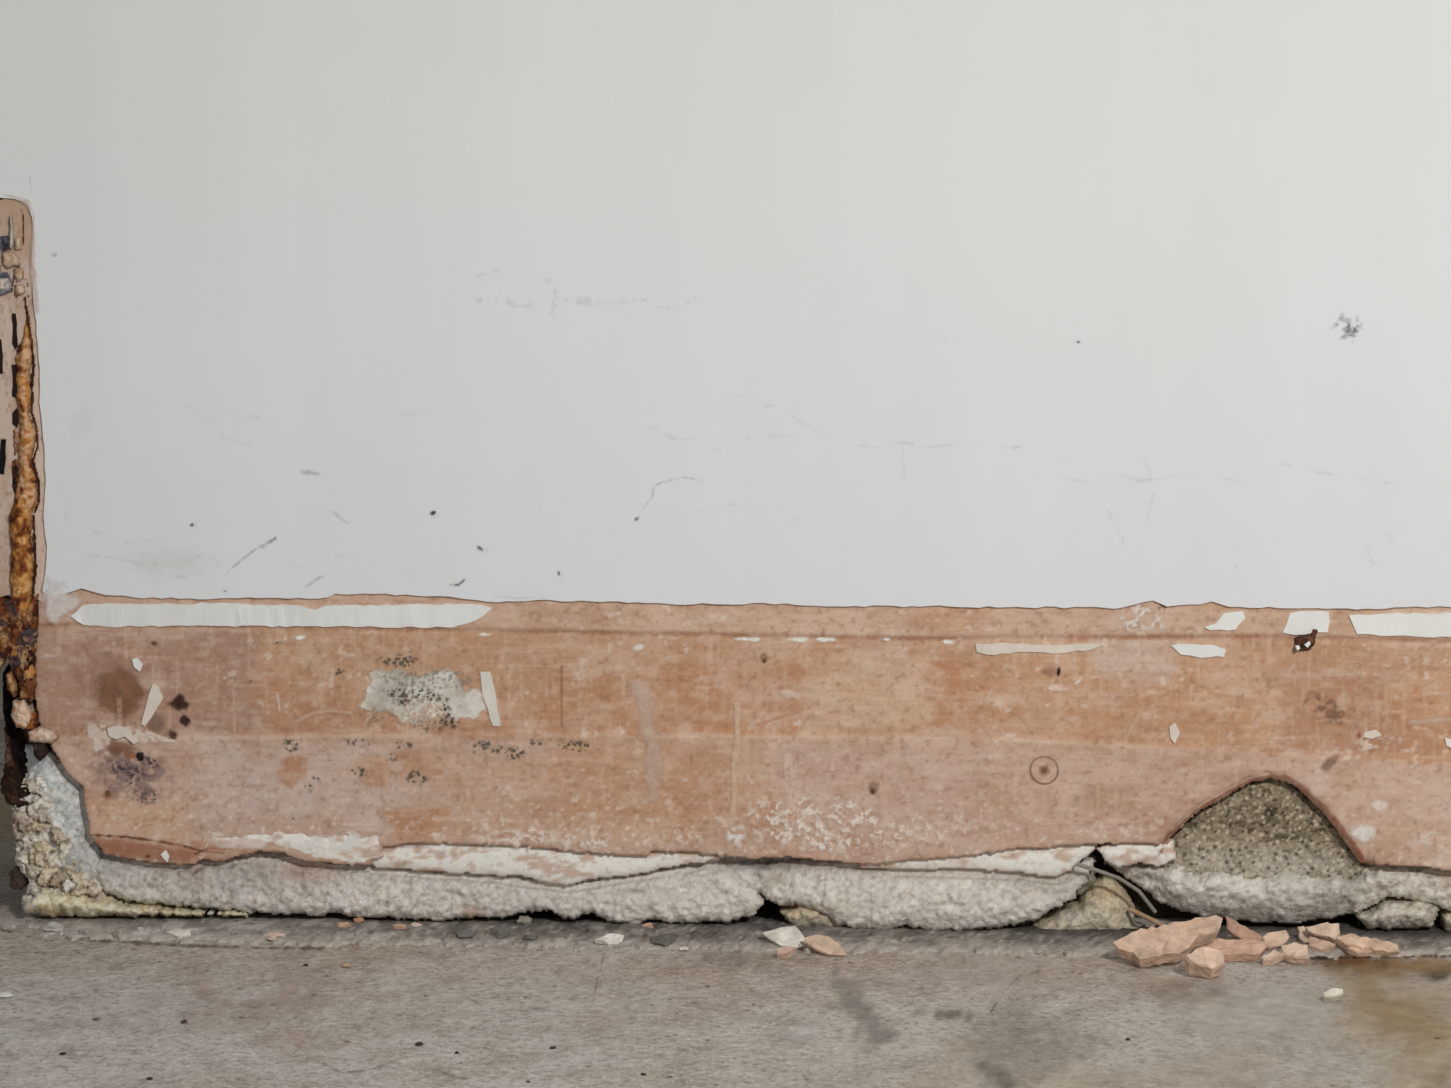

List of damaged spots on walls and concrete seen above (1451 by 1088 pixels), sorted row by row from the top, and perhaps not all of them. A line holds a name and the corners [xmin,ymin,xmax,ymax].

corrosion [0,320,37,610]
corrosion [6,665,60,761]
leakage [369,654,467,760]
leakage [473,740,542,759]
peeling [2,588,1451,965]